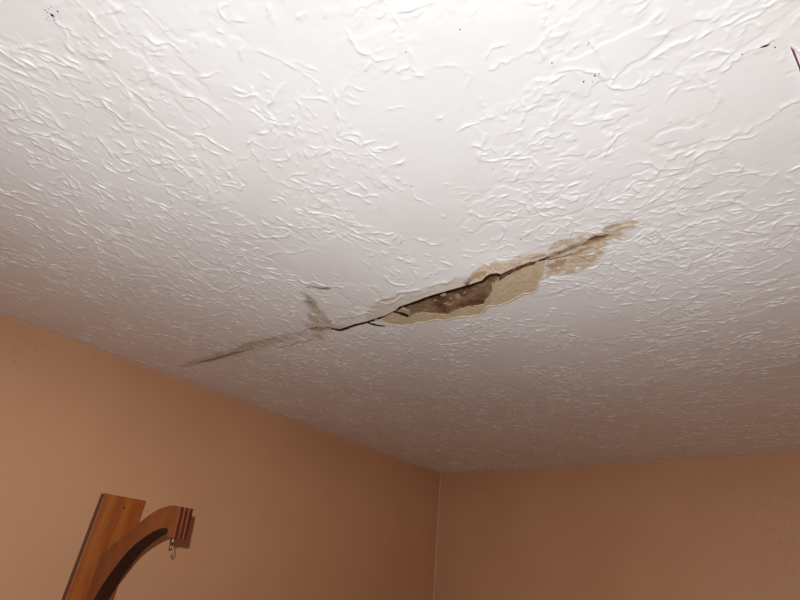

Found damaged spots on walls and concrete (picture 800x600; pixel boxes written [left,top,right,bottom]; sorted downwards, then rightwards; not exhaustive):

water stain [469,221,637,285]
crack [279,237,600,348]
peeling [379,261,548,326]